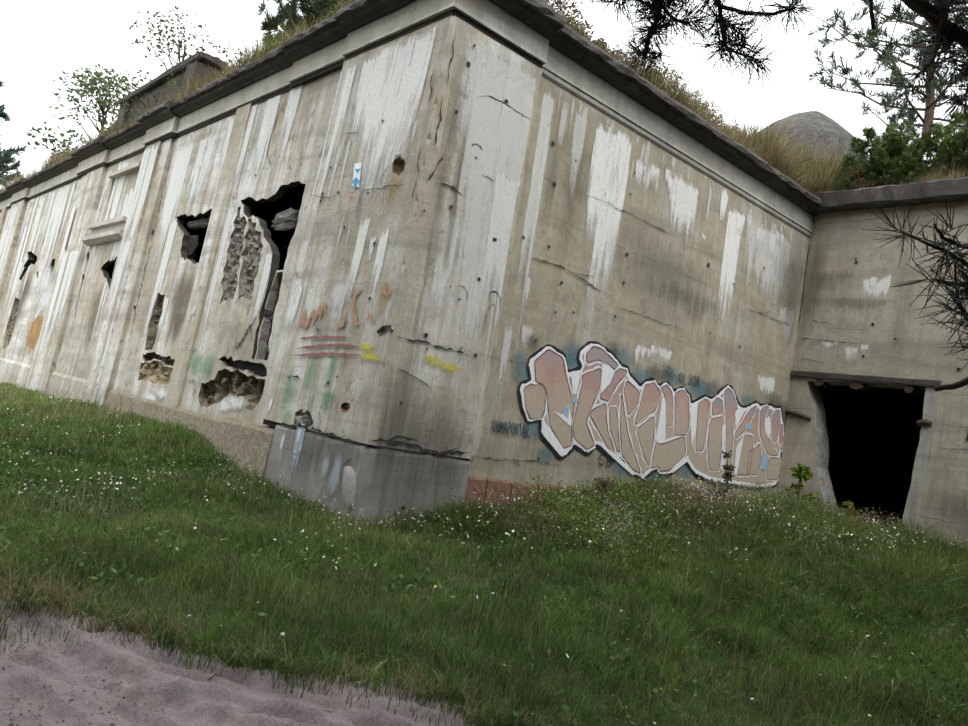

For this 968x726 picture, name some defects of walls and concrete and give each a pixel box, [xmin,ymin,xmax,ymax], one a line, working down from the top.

damp [303,25,437,264]
corrosion [26,316,43,352]
spalling [138,293,173,401]
spalling [198,369,265,411]
spalling [220,207,263,304]
spalling [256,271,283,361]
damp [332,216,400,320]
damp [435,44,794,379]
damp [758,375,775,394]